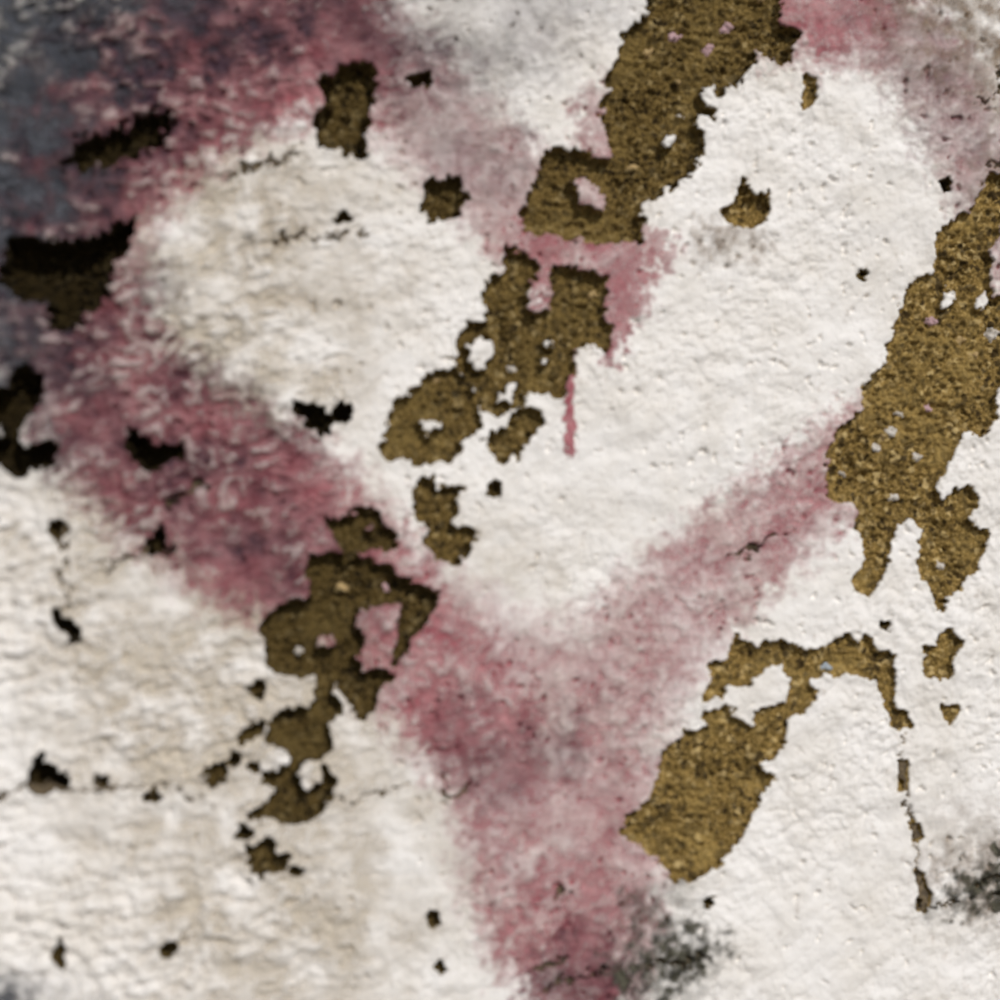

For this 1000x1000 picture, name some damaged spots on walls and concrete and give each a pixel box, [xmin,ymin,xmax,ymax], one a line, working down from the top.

peeling [0,216,138,332]
peeling [55,106,178,176]
peeling [312,61,380,161]
spalling [419,174,471,225]
peeling [518,0,802,246]
peeling [0,363,61,479]
peeling [377,243,615,566]
peeling [823,171,1000,612]
peeling [199,506,441,882]
peeling [618,632,914,884]
spalling [921,628,964,682]
crack [893,727,1000,913]